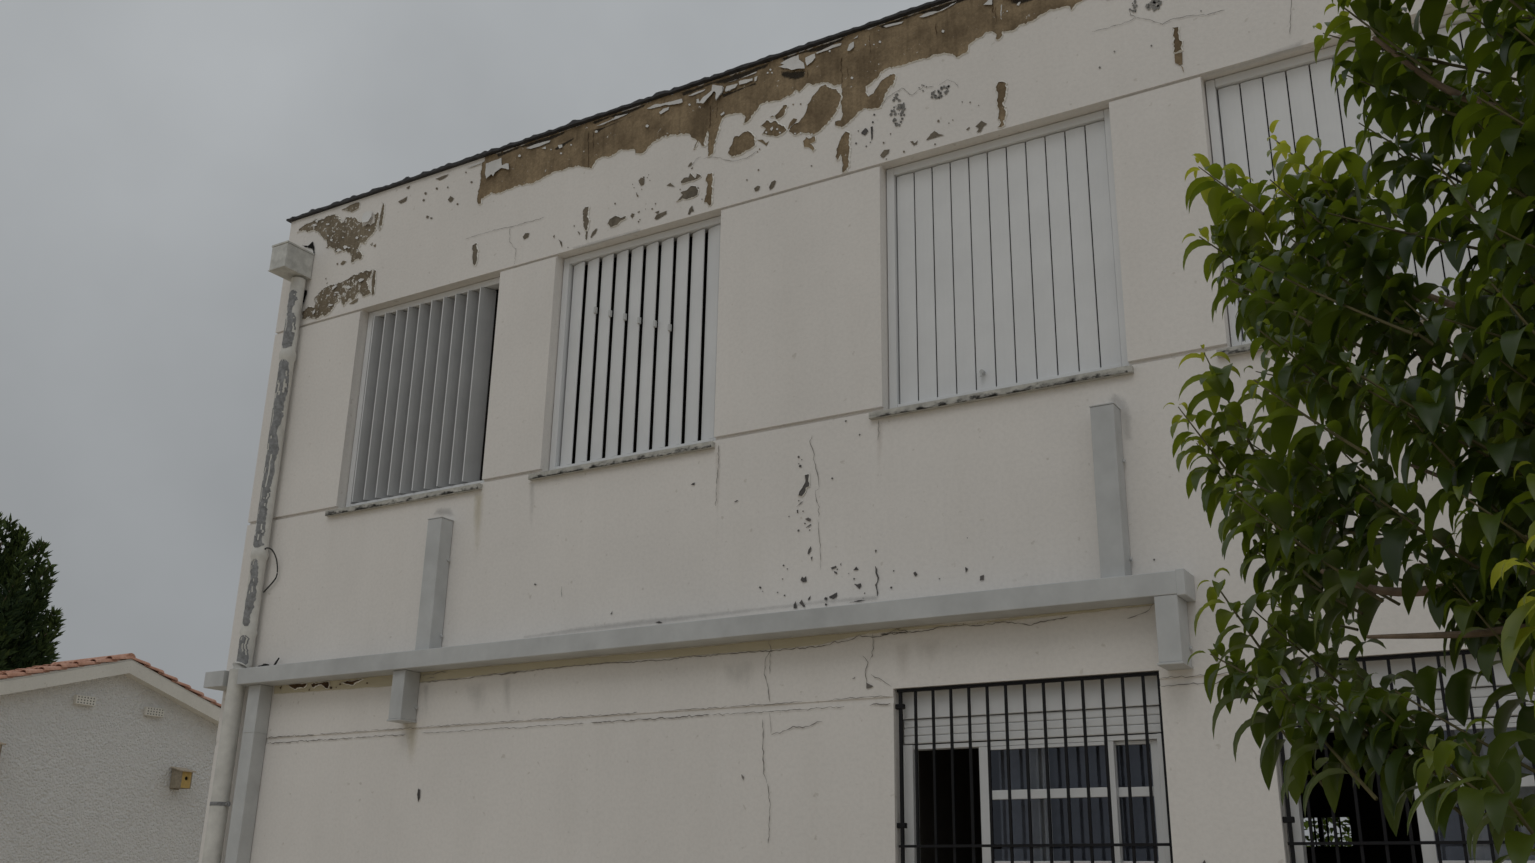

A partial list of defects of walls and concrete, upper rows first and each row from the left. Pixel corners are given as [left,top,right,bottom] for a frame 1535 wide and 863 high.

peeling [1129,0,1162,12]
peeling [1172,26,1184,72]
peeling [237,0,1085,665]
crack [1162,671,1249,687]
crack [268,617,1067,840]